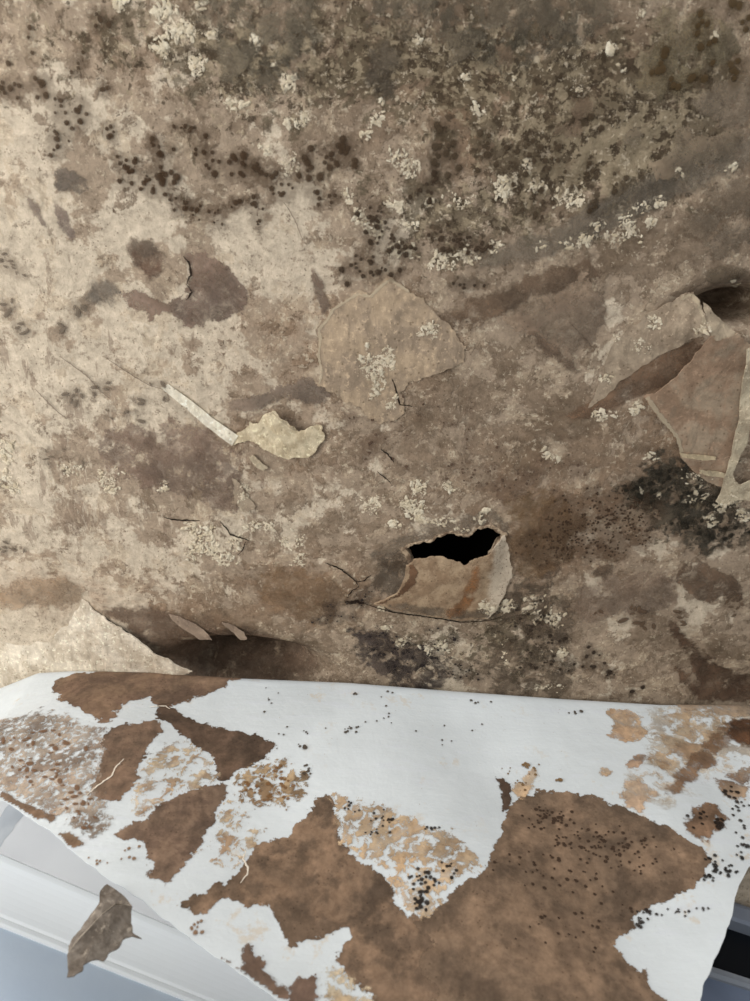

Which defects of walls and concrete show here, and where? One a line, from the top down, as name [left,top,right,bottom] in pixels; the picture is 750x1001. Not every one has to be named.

leakage [148,0,322,101]
leakage [115,136,264,226]
leakage [172,122,750,339]
flaking render [161,384,325,471]
flaking render [316,276,466,424]
flaking render [588,292,750,508]
crack [164,517,249,555]
crack [326,563,503,623]
spalling [409,527,500,565]
leakage [180,446,750,733]
leakage [0,607,318,884]
leakage [180,754,750,1001]